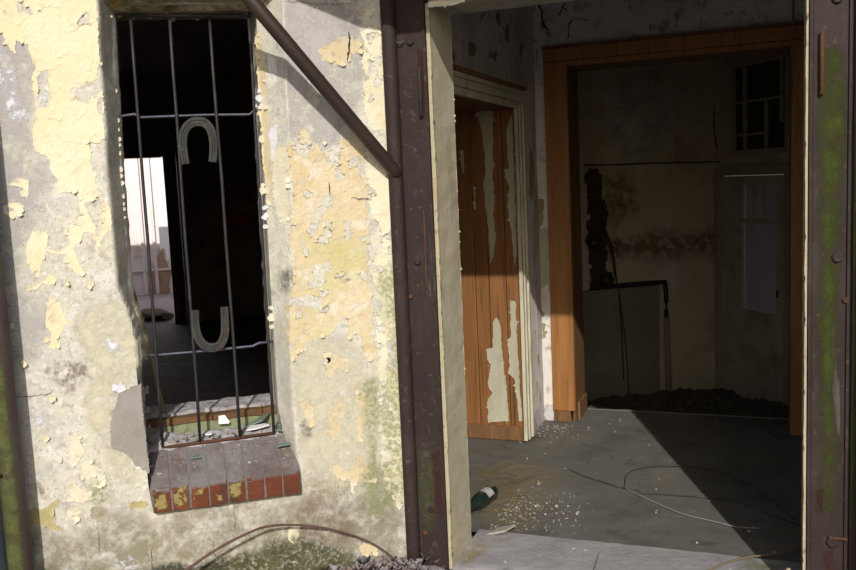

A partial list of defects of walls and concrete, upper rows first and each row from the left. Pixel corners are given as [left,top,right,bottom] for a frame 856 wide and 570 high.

crack [537,3,588,40]
peeling [40,297,71,349]
peeling [0,0,135,291]
leakage [78,303,143,437]
flaking render [109,368,151,473]
leakage [45,328,400,570]
peeling [254,26,404,511]
peeling [471,81,553,423]